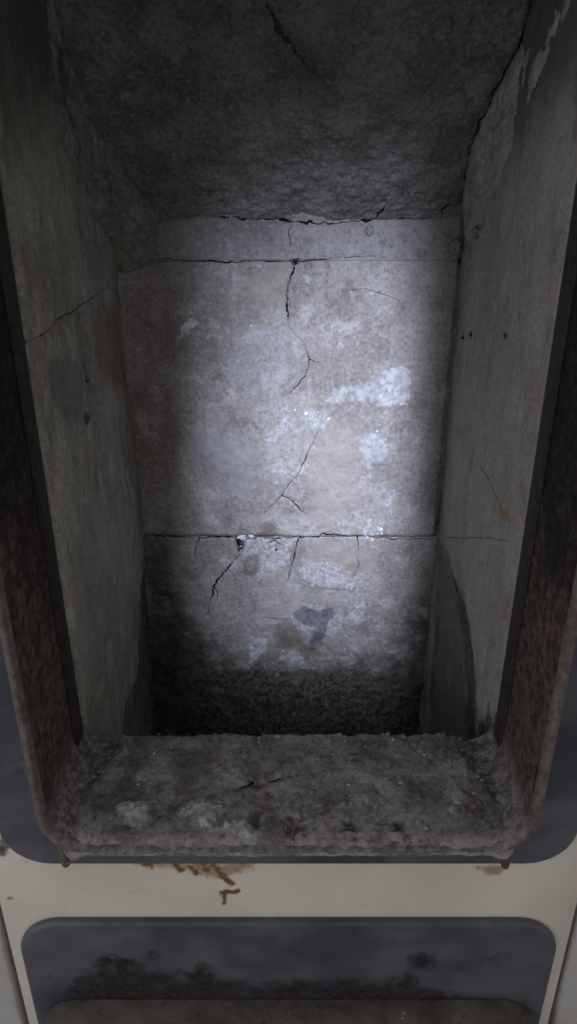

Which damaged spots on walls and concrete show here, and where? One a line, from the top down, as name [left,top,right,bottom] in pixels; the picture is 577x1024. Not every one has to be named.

crack [266,0,316,76]
crack [25,284,109,343]
crack [159,205,409,397]
crack [136,438,505,616]
damp [294,607,333,649]
corrosion [140,864,251,905]